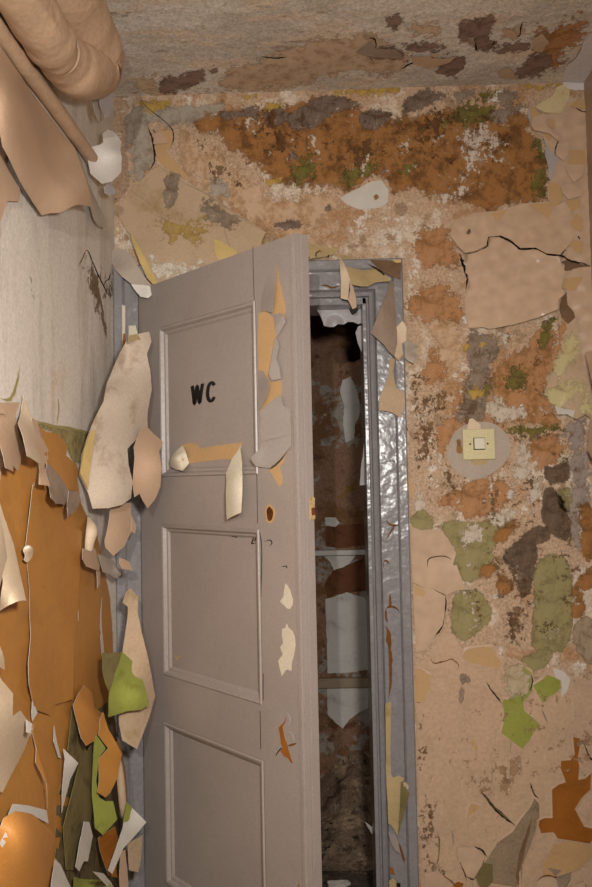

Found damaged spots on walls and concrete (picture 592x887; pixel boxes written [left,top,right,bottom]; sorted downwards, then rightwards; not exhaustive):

flaking render [0,46,271,298]
leakage [273,219,303,231]
leakage [134,10,590,207]
peeling [308,243,417,418]
peeling [450,99,592,419]
crack [459,236,590,287]
crack [559,292,575,324]
peeling [0,261,291,887]
flaking render [325,558,366,598]
peeling [410,524,465,652]
crack [435,831,488,881]
crack [482,793,514,825]